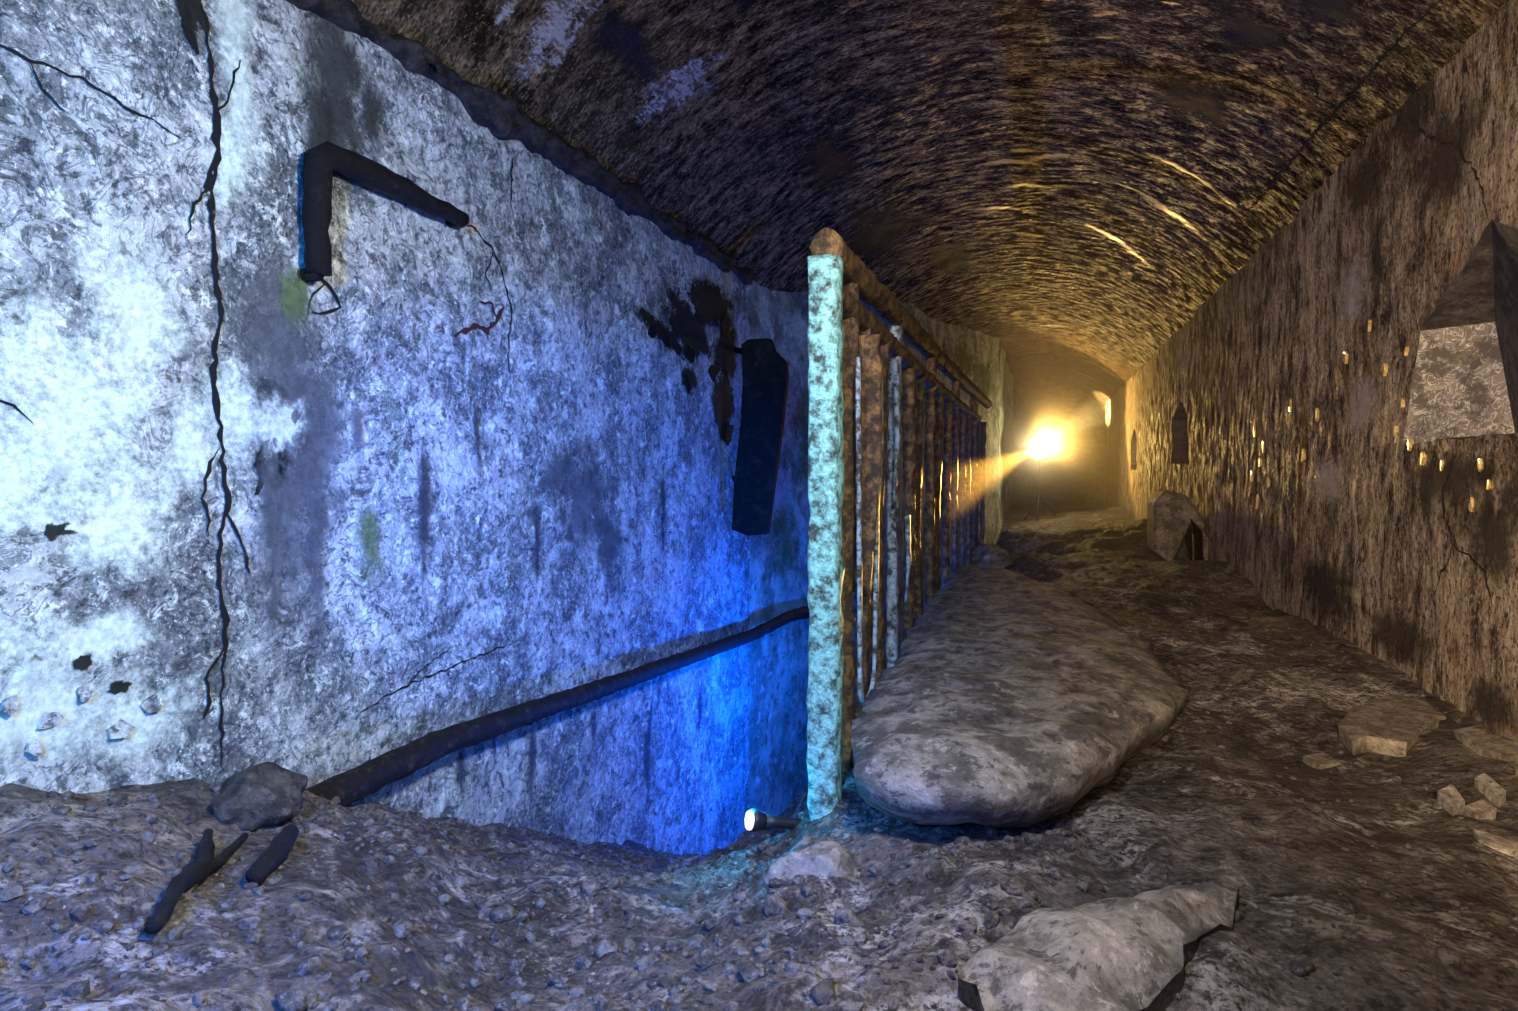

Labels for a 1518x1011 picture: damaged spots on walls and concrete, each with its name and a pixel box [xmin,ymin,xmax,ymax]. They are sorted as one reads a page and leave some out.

crack [0,1,251,771]